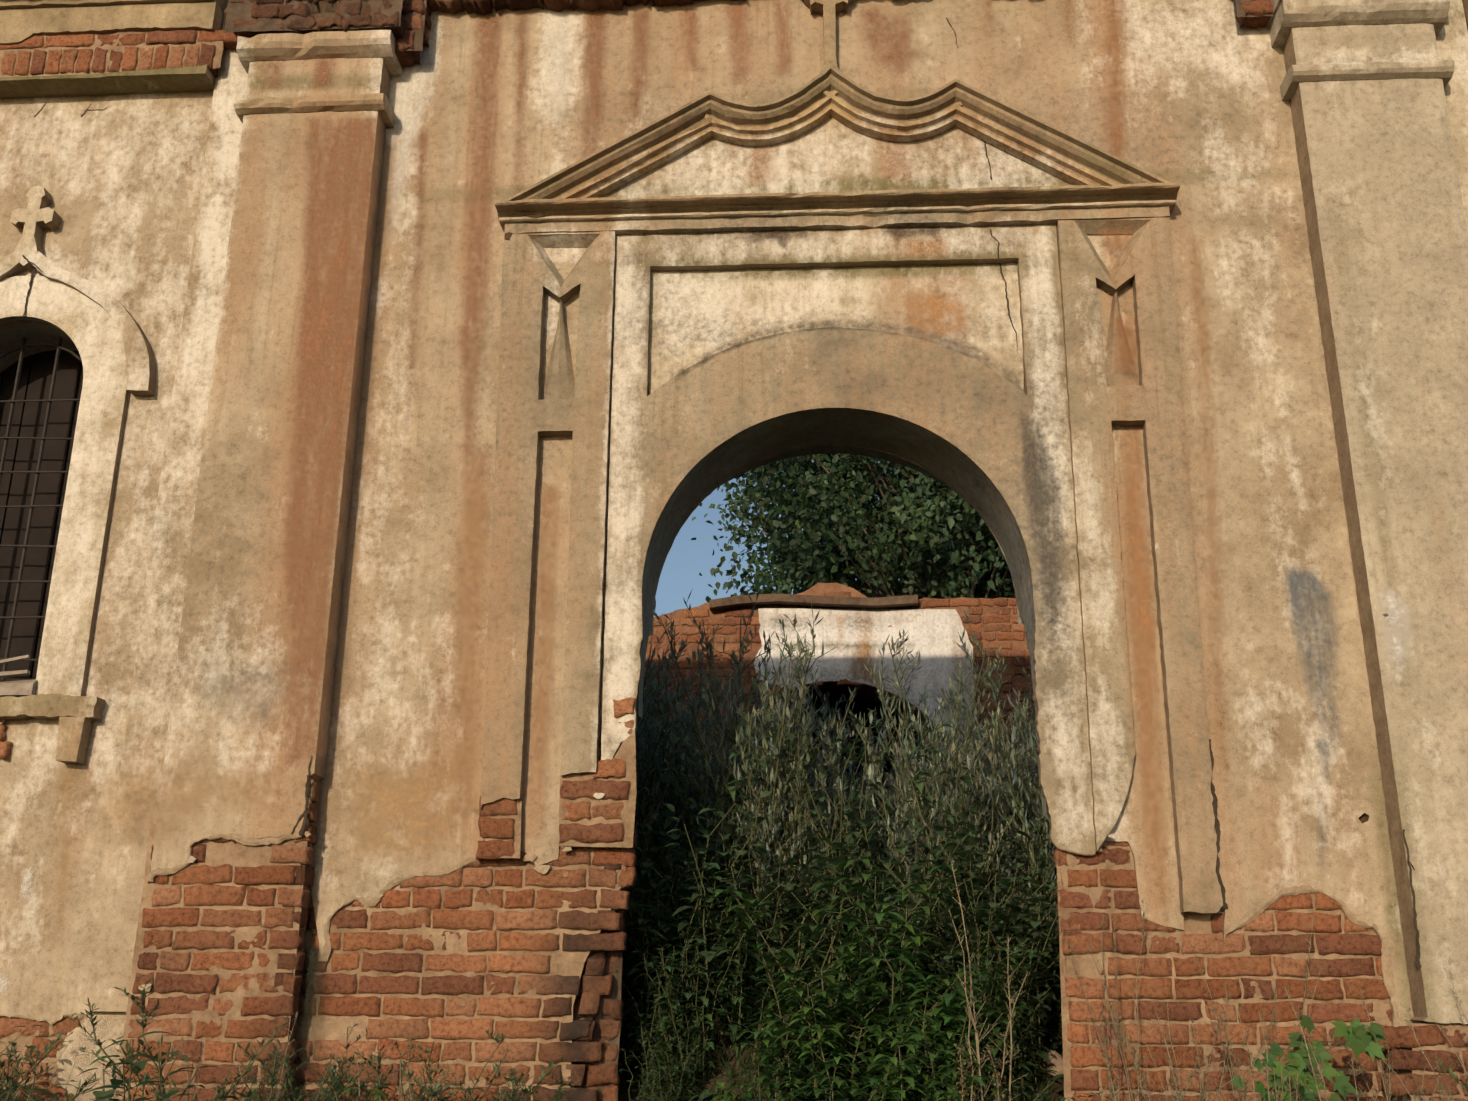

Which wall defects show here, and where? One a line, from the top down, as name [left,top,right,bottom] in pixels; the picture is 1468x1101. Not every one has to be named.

spalling [0,0,746,82]
crack [982,140,992,180]
crack [990,229,1018,354]
spalling [0,719,12,760]
crack [1209,739,1228,909]
spalling [115,697,638,1101]
crack [1403,829,1422,968]
spalling [1049,834,1468,1101]
spalling [0,1013,87,1101]